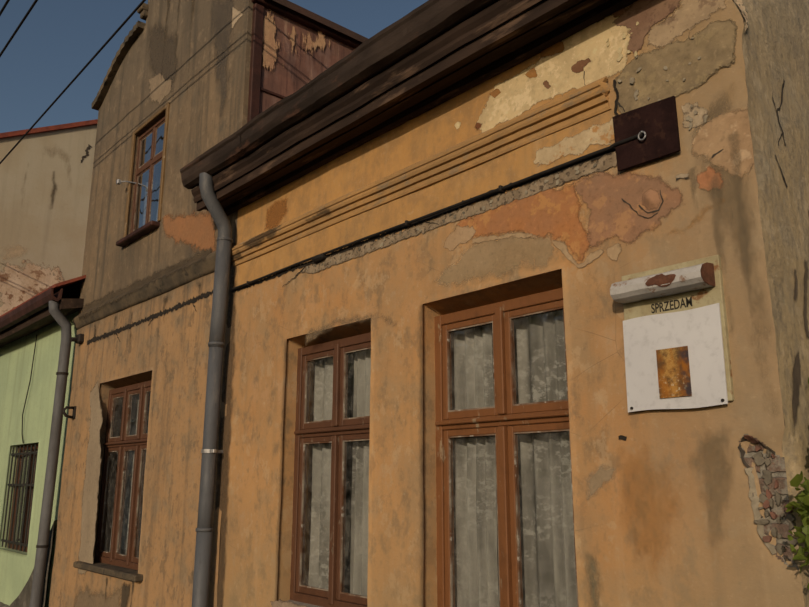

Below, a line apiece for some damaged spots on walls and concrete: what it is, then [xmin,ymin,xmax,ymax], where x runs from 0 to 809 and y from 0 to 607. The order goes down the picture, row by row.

flaking render [148,73,171,104]
crack [81,144,92,163]
flaking render [301,0,754,274]
crack [772,80,788,187]
flaking render [163,212,216,252]
spalling [0,259,64,316]
spalling [738,434,799,570]